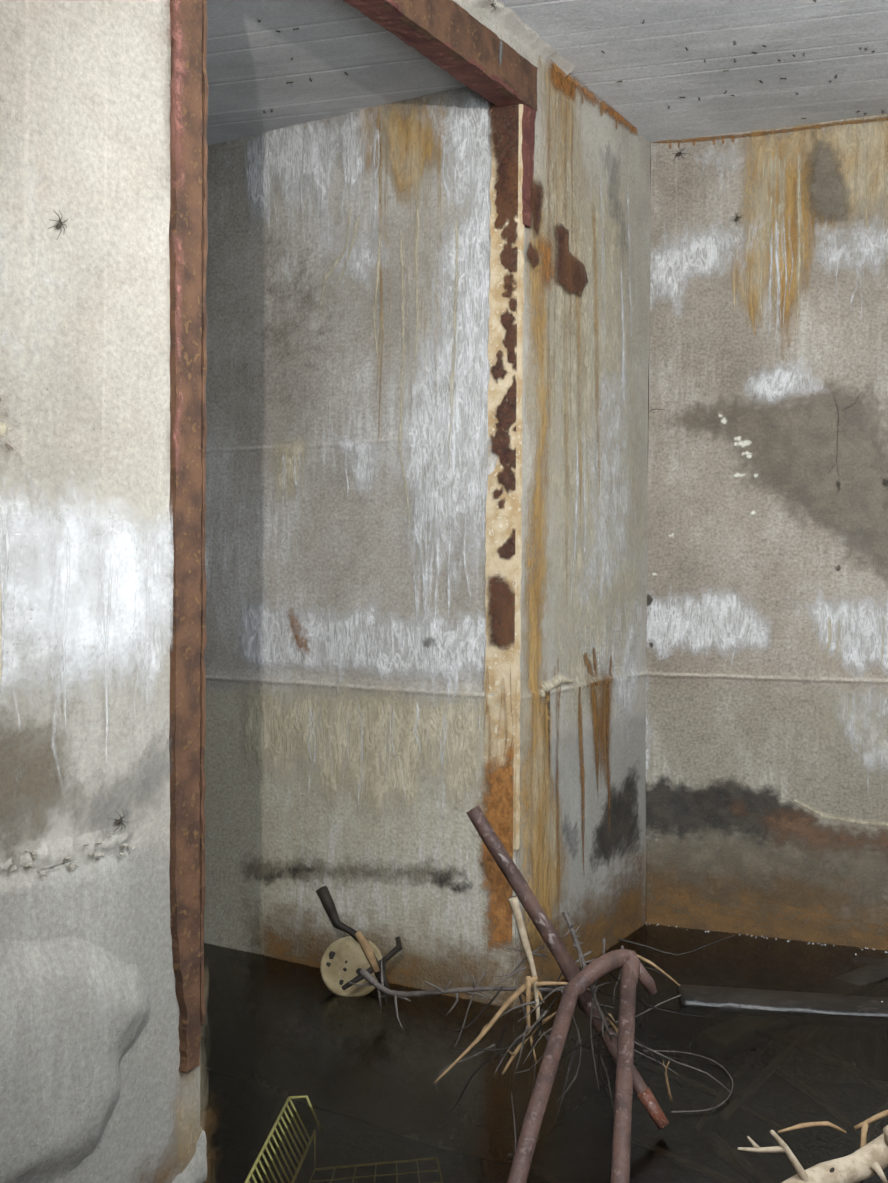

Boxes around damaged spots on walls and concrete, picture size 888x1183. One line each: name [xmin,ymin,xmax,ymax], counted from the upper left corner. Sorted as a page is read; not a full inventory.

rust [366,97,447,543]
rust [653,117,888,348]
rust [746,366,816,401]
rust [483,62,637,921]
damp [680,385,888,580]
damp [0,497,172,732]
damp [812,600,888,672]
damp [248,861,380,884]
damp [251,926,568,1055]
damp [396,868,471,892]
rust [481,842,544,951]
damp [554,750,888,988]